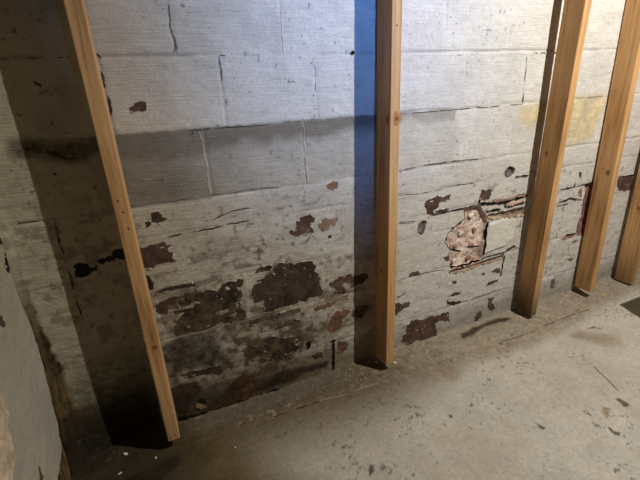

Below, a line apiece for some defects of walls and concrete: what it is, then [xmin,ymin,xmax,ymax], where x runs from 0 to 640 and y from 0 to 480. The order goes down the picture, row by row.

crack [168,5,177,53]
peeling [129,101,147,114]
peeling [617,175,633,192]
peeling [289,215,338,238]
peeling [74,249,125,278]
spalling [402,188,526,346]
peeling [140,241,323,363]
peeling [314,273,369,333]
water stain [171,382,201,418]